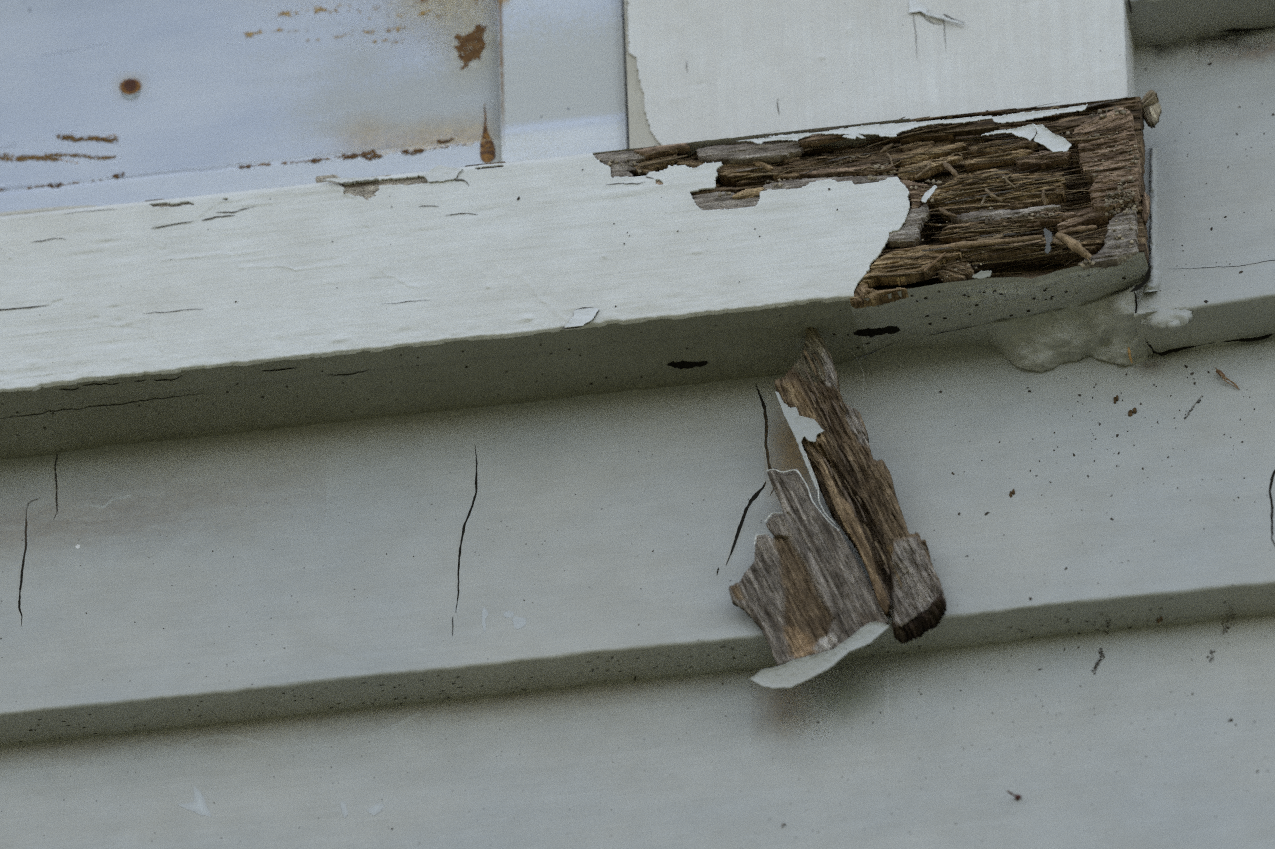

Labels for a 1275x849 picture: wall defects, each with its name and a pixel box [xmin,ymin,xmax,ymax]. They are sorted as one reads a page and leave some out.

corrosion [453,0,503,99]
corrosion [0,133,119,164]
corrosion [27,172,125,190]
corrosion [239,149,383,169]
corrosion [400,107,495,163]
peeling [737,104,1088,153]
peeling [921,185,937,203]
peeling [972,270,992,280]
crack [717,383,775,574]
crack [1267,470,1275,546]
crack [16,454,61,626]
crack [452,446,480,637]